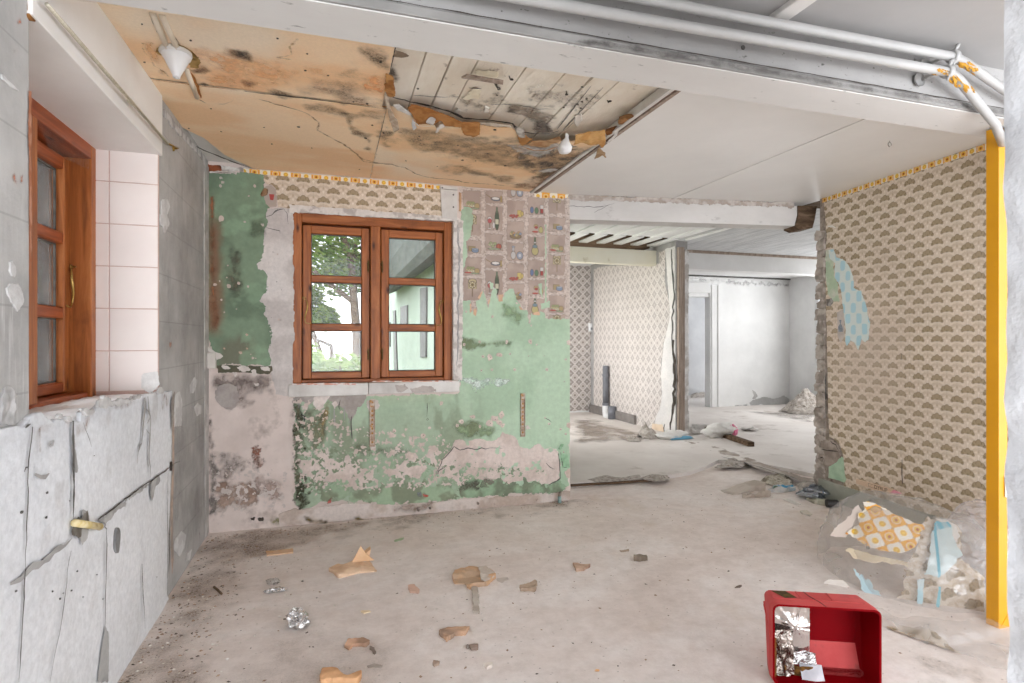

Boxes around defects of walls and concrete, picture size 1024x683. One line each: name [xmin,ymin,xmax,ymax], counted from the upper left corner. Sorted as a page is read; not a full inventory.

leakage [195,50,289,108]
crack [156,80,386,155]
mould [365,51,397,80]
leakage [379,93,596,189]
peeling [932,61,979,93]
peeling [209,172,282,386]
spalling [54,371,175,474]
leakage [214,375,270,401]
leakage [209,420,279,514]
peeling [211,225,570,521]
spalling [813,230,846,484]
crack [19,424,33,676]